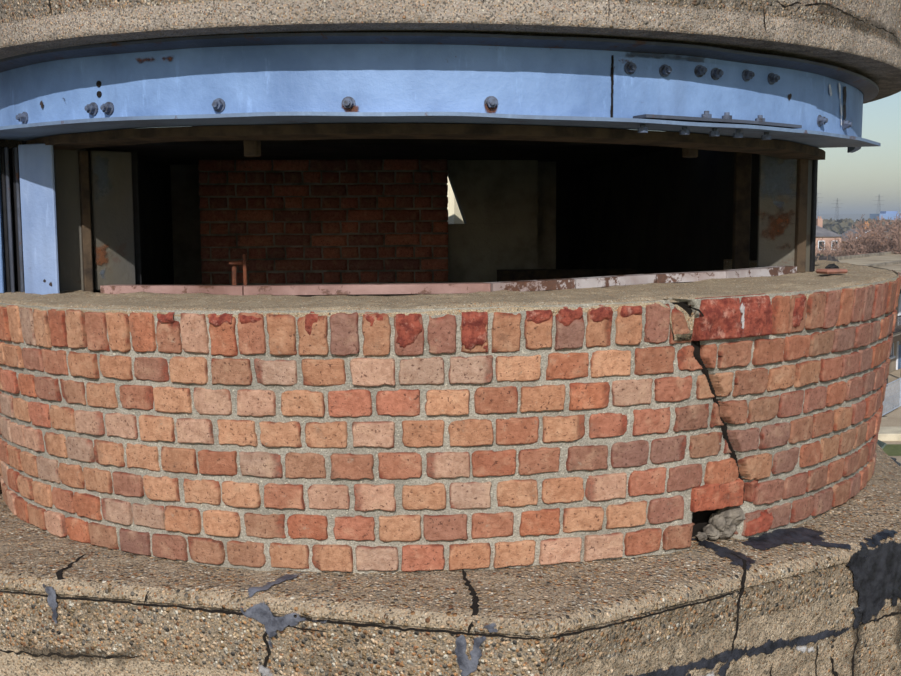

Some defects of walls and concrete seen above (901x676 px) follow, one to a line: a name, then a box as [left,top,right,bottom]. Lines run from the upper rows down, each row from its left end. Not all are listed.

crack [764,1,900,40]
crack [670,302,745,503]
crack [0,553,747,676]
damp [629,627,850,676]